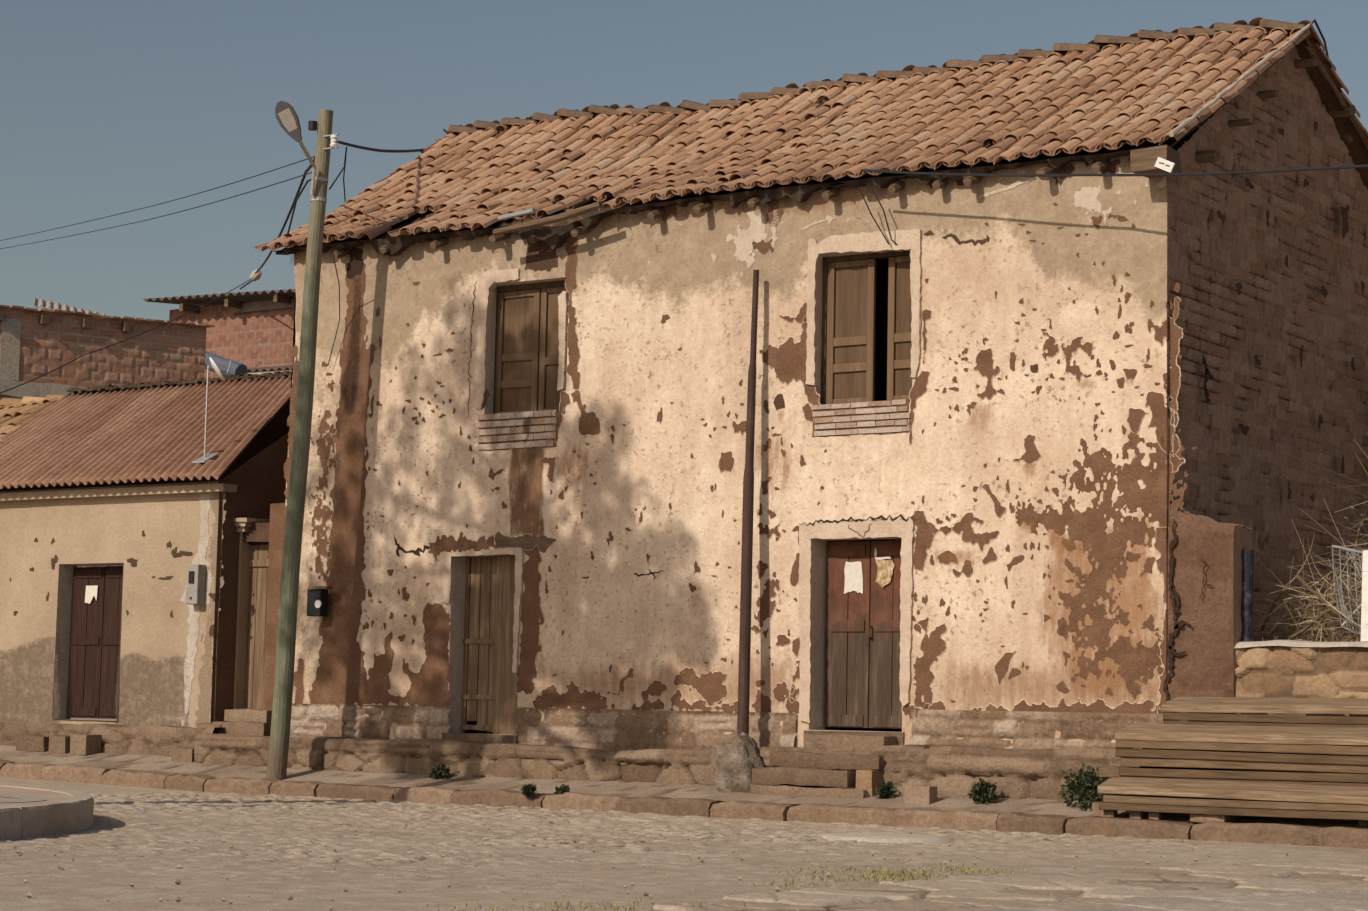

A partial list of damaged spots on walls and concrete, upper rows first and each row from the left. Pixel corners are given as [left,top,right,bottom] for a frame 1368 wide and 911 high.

peeling [1053,158,1130,185]
peeling [281,247,451,711]
crack [394,534,432,557]
peeling [402,381,507,509]
peeling [428,523,495,562]
peeling [525,235,626,500]
peeling [515,476,800,715]
peeling [701,396,746,492]
peeling [759,302,820,467]
peeling [902,181,1197,724]